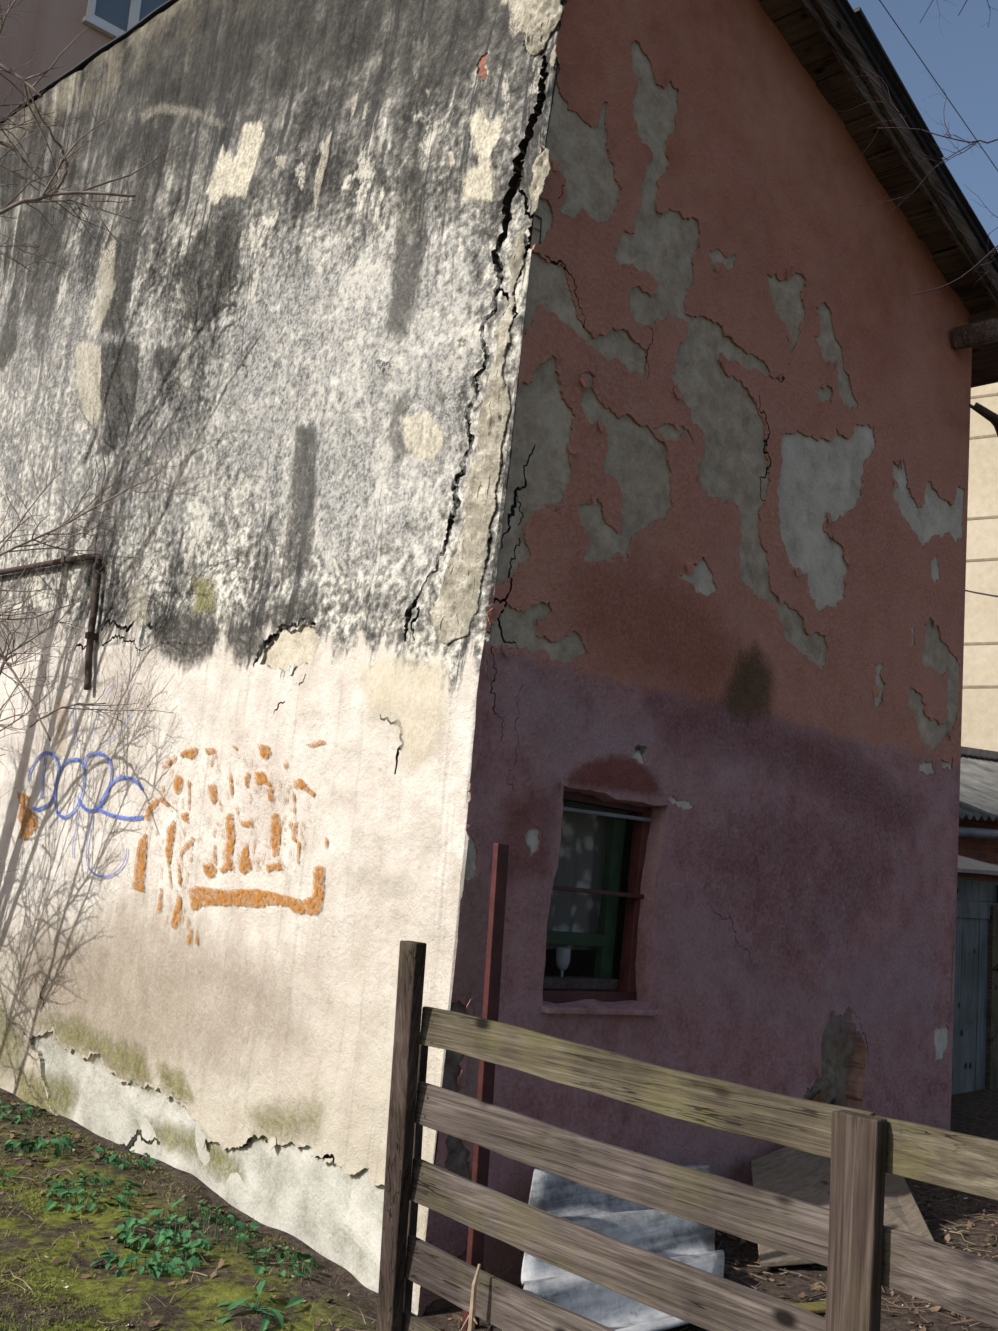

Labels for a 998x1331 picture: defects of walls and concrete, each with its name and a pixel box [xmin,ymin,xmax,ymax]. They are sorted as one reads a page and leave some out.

water stain [76,129,176,455]
water stain [179,122,264,322]
water stain [151,424,321,670]
water stain [402,411,444,460]
water stain [449,109,503,202]
crack [404,1,586,642]
crack [490,445,535,791]
spalling [486,40,877,669]
spalling [23,1030,384,1293]
spalling [442,1050,467,1094]
spalling [802,1006,867,1110]
spalling [411,1284,454,1315]